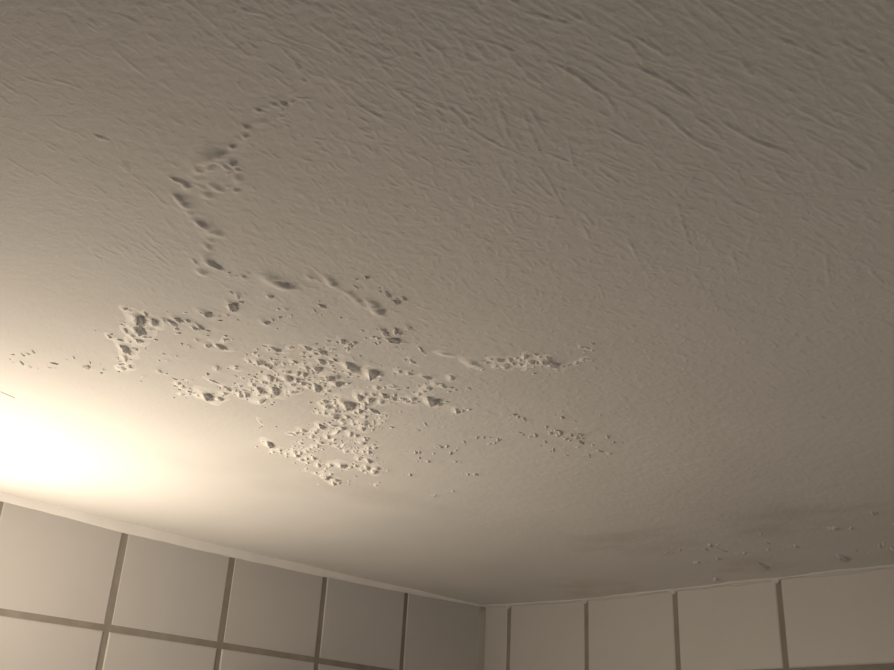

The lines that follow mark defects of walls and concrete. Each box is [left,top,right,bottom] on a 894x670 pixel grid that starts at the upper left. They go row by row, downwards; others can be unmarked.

peeling [9,266,595,487]